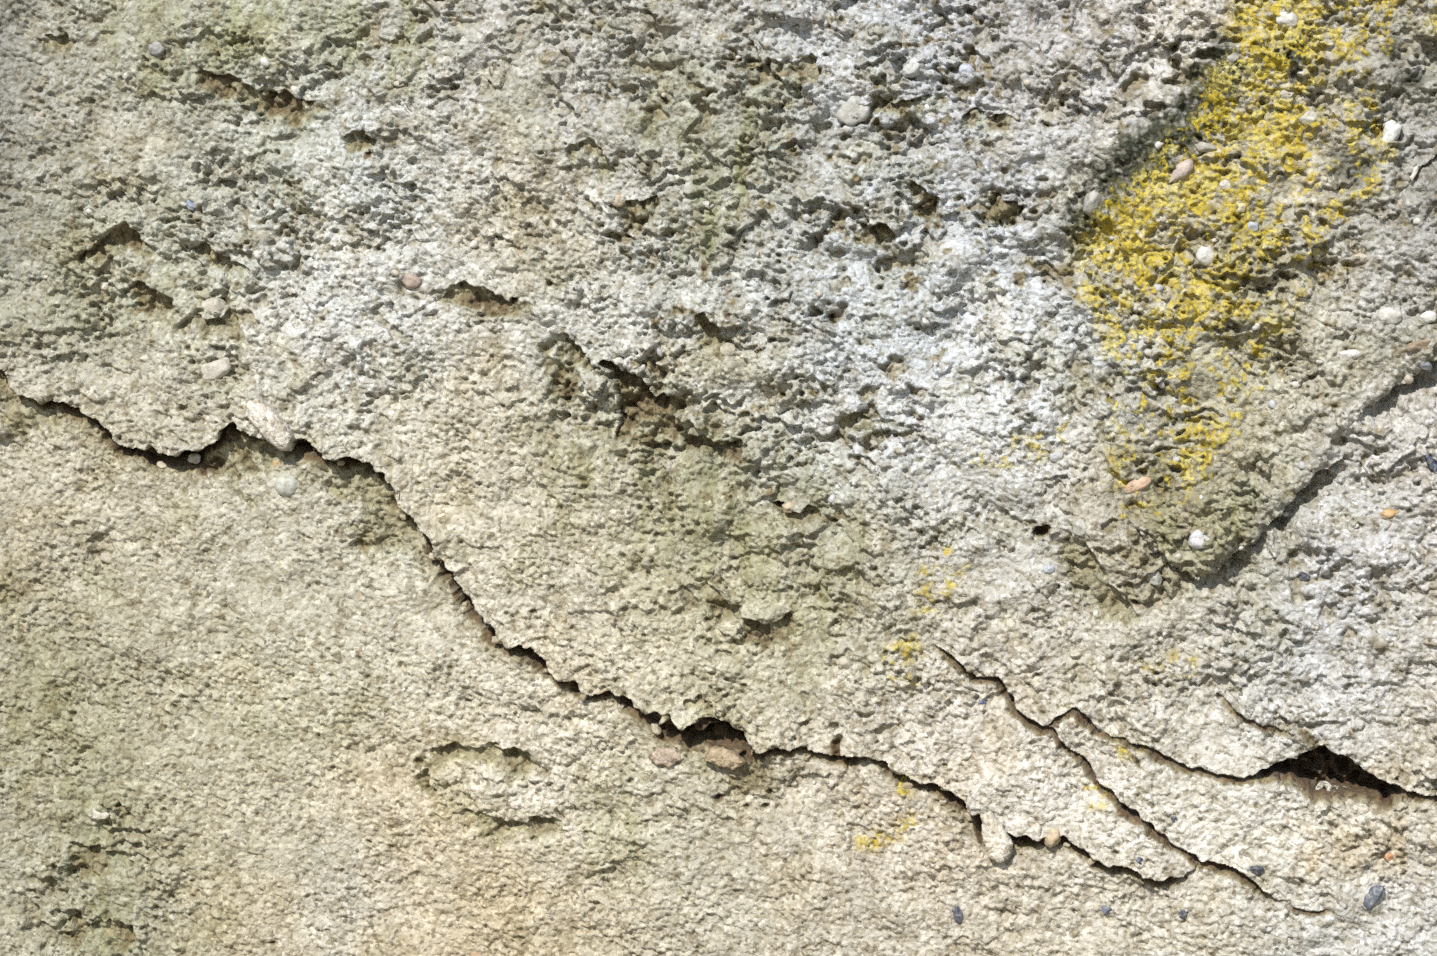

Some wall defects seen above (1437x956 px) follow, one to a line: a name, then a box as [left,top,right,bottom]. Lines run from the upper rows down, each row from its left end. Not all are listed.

crack [0,363,1344,920]
crack [1388,780,1437,808]